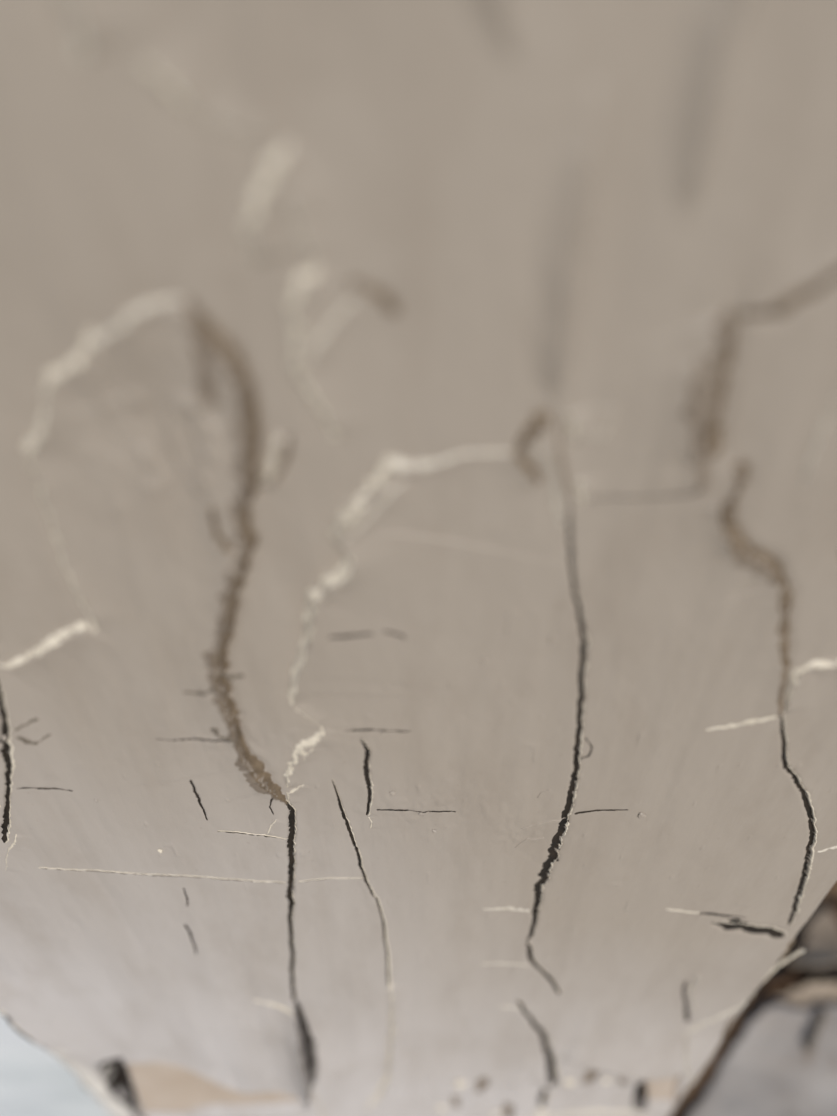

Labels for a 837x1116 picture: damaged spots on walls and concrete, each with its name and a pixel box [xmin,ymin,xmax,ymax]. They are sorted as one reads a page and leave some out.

crack [0,682,72,868]
peeling [0,297,183,669]
crack [39,298,456,1116]
peeling [283,451,513,803]
crack [525,492,628,994]
crack [682,270,837,938]
peeling [784,660,837,714]
crack [1,1009,89,1066]
peeling [51,1051,313,1116]
crack [517,1000,560,1107]